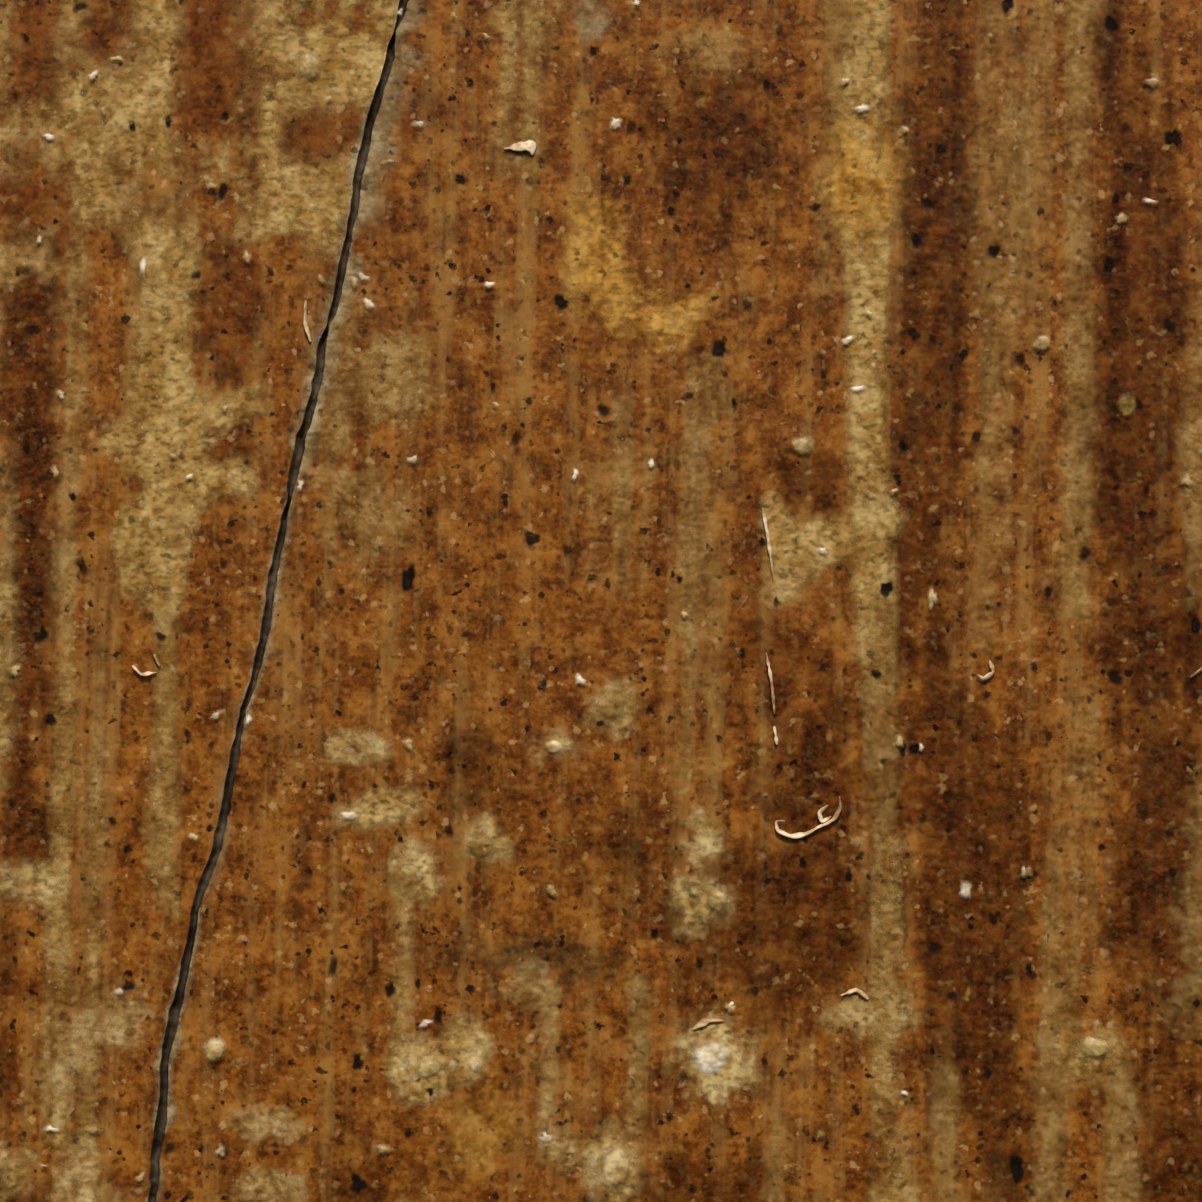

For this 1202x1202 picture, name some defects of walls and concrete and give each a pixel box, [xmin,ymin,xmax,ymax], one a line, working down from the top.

leakage [0,555,15,755]
corrosion [0,221,60,871]
crack [146,0,417,1202]
peeling [775,796,842,839]
leakage [871,1025,919,1202]
corrosion [861,640,1031,1118]
corrosion [1081,75,1202,1028]
spalling [1191,616,1201,633]